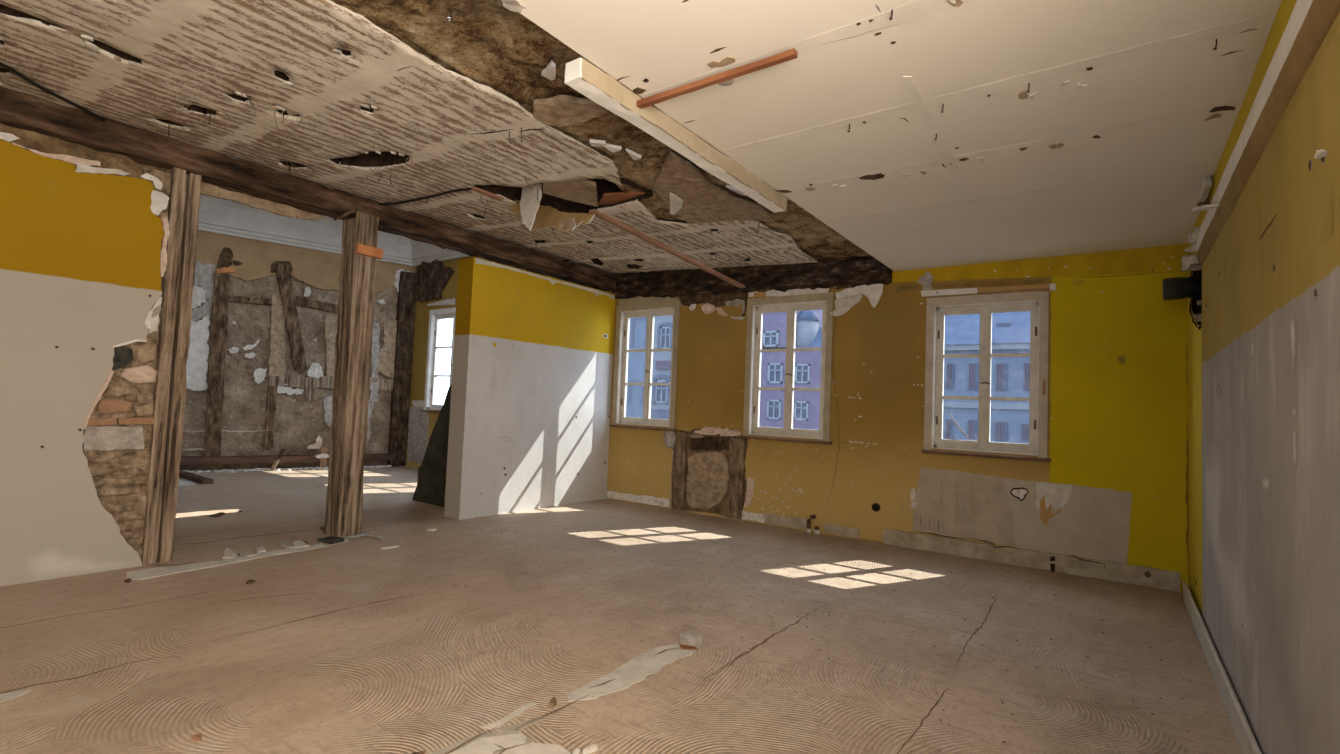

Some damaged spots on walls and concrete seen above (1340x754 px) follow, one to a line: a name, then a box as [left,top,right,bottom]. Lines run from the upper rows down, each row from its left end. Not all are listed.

spalling [0,4,65,29]
spalling [88,39,142,64]
spalling [547,53,578,73]
spalling [154,105,219,127]
spalling [330,151,410,167]
flaking render [201,182,326,221]
spalling [473,185,523,202]
spalling [540,178,653,213]
flaking render [475,258,884,320]
flaking render [0,132,171,561]
flaking render [408,400,430,463]
flaking render [628,425,804,520]